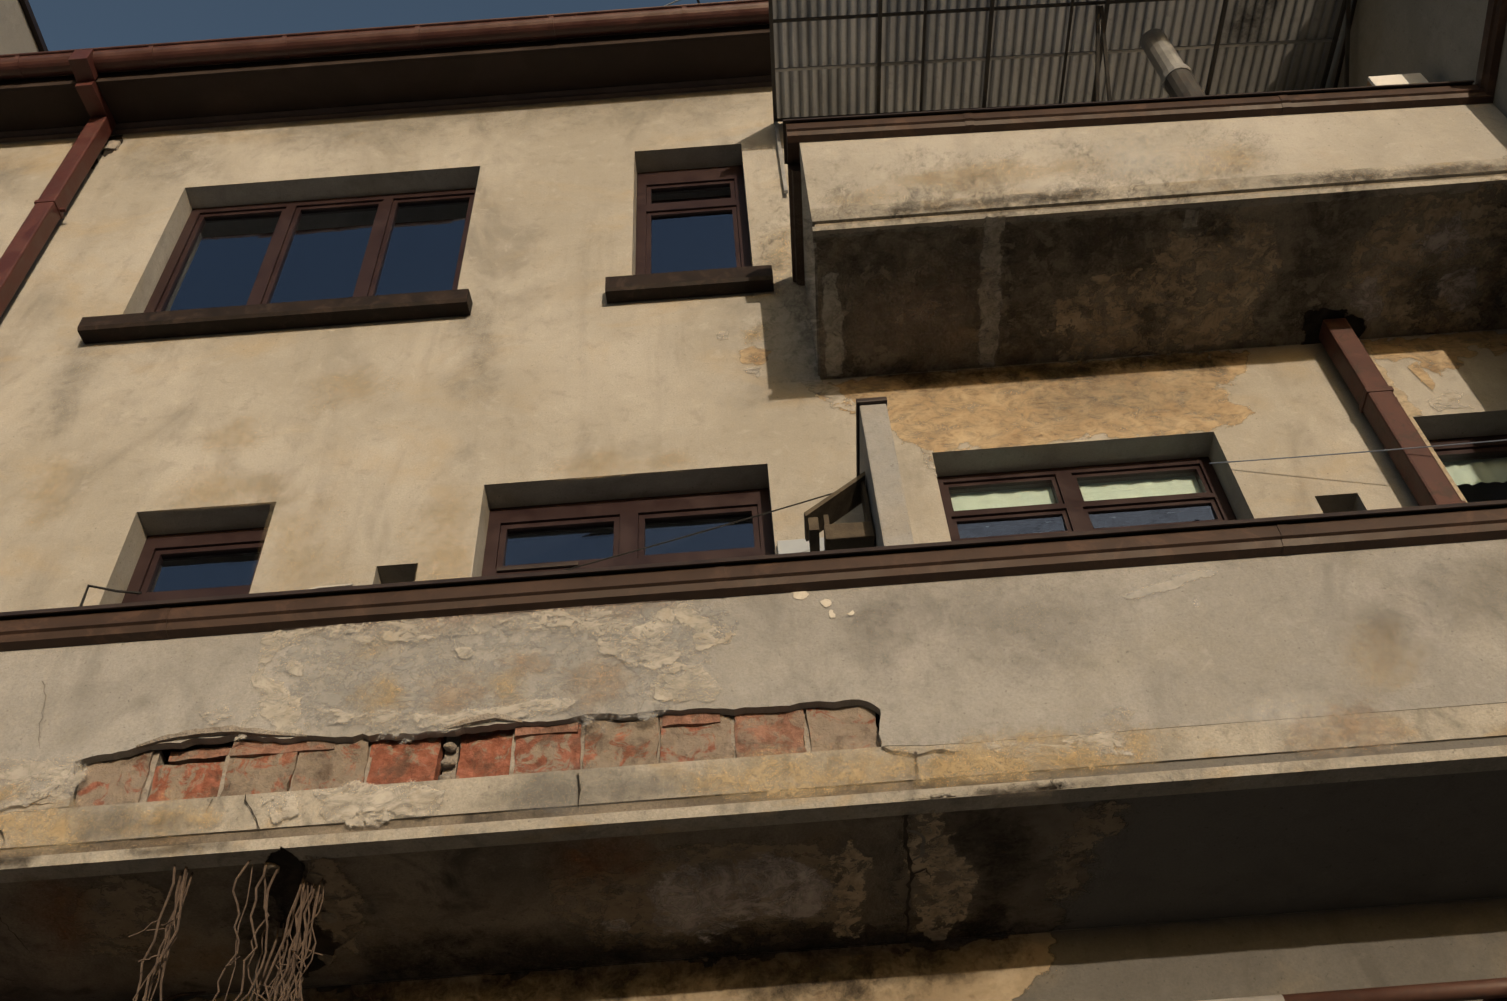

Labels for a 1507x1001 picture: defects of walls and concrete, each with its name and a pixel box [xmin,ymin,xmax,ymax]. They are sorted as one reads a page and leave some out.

peeling [1321,155,1507,182]
leakage [791,185,1206,378]
peeling [1300,276,1507,503]
peeling [793,591,855,618]
crack [0,785,61,846]
crack [38,681,47,752]
flaking render [0,600,881,827]
leakage [683,732,1147,799]
spalling [171,846,367,1001]
leakage [294,813,1030,1001]
flaking render [356,810,1057,1001]